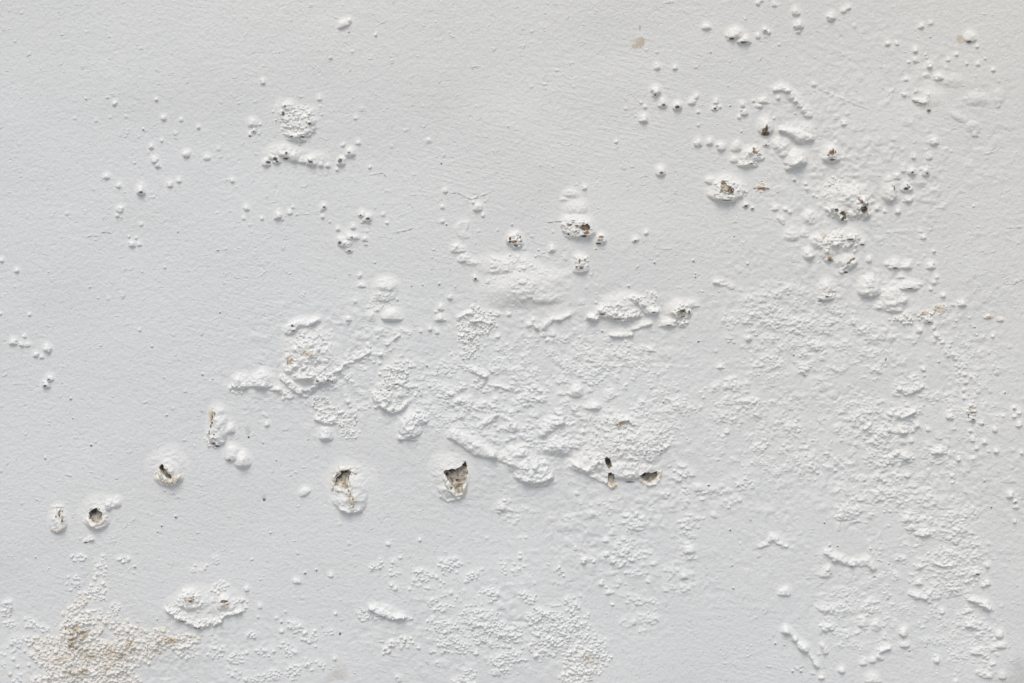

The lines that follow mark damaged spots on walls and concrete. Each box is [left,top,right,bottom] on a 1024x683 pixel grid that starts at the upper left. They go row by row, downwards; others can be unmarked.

peeling [274,278,1013,683]